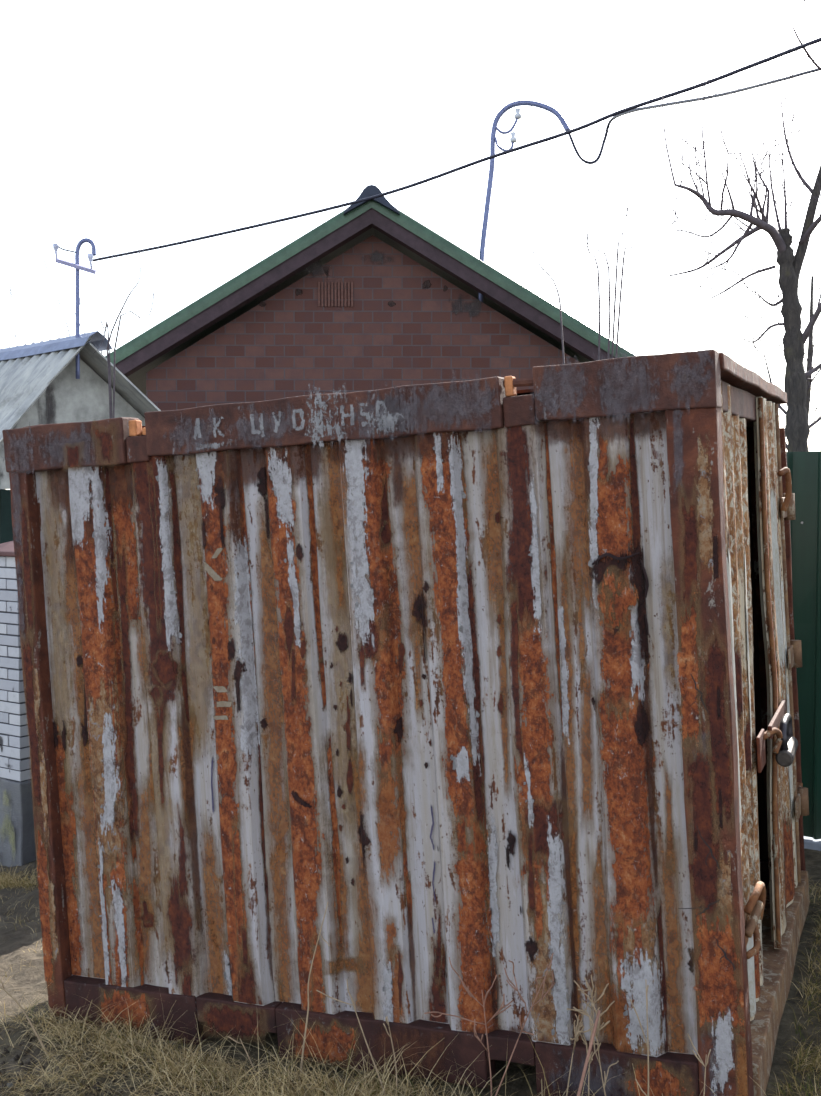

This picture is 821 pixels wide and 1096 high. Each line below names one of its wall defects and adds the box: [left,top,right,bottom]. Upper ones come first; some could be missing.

peeling [3,423,112,641]
peeling [155,458,182,651]
peeling [170,404,301,654]
peeling [305,376,499,783]
peeling [532,342,752,824]
rust [763,402,787,729]
rust [22,636,42,807]
rust [37,830,54,988]
peeling [98,706,127,987]
rust [46,383,760,1096]
rust [777,763,795,923]
peeling [701,1008,735,1096]